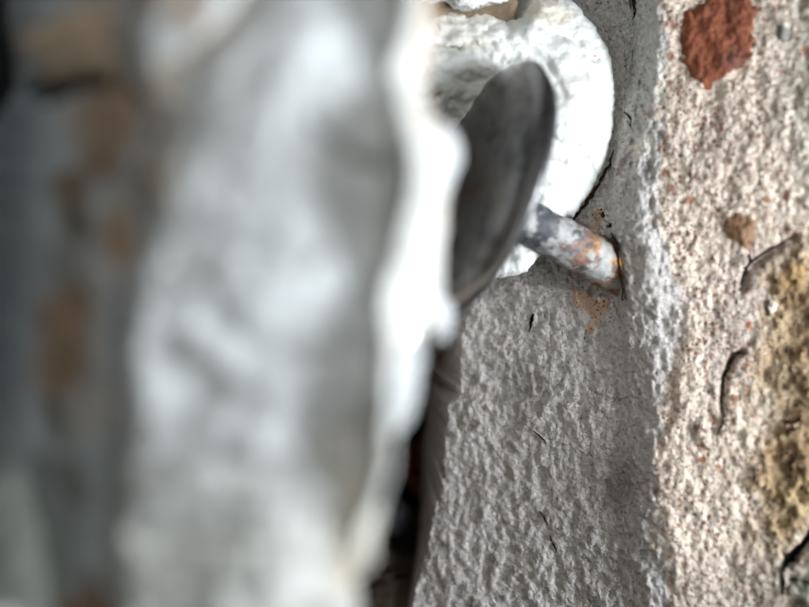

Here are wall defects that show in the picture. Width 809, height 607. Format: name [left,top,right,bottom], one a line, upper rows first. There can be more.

flaking render [679,0,756,90]
crack [572,150,614,221]
crack [717,351,745,435]
crack [782,532,809,595]